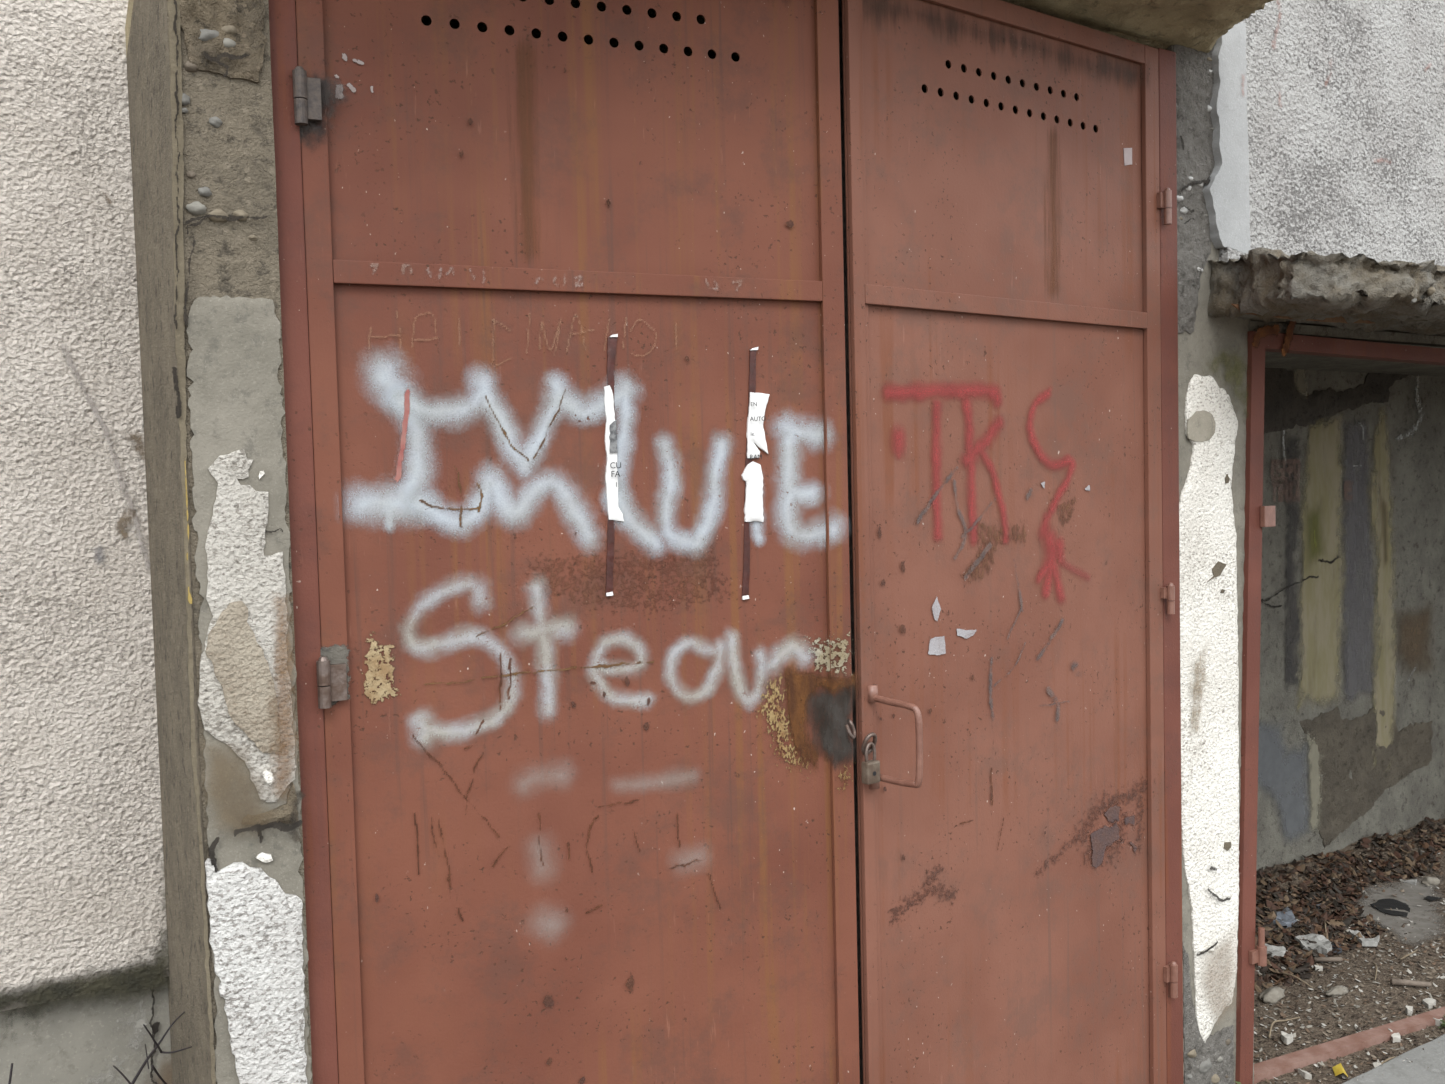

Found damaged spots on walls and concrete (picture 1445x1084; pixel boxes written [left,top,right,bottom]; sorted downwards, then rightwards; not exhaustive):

spalling [1173,44,1215,334]
flaking render [197,449,304,842]
rust [755,631,856,792]
flaking render [1179,374,1240,1084]
flaking render [204,852,307,1084]